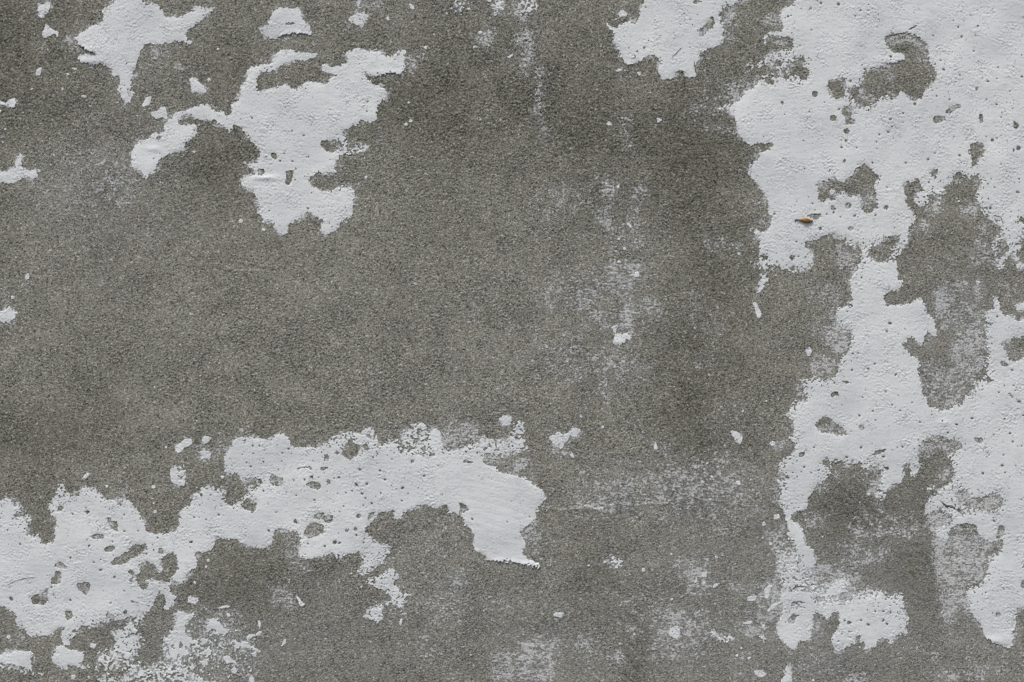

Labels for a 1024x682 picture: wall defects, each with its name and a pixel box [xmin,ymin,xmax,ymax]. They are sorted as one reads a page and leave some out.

peeling [446,0,542,19]
peeling [0,98,21,113]
peeling [0,140,62,242]
peeling [36,0,435,287]
peeling [0,264,68,331]
peeling [519,320,665,418]
peeling [600,0,1024,682]
peeling [0,359,603,682]